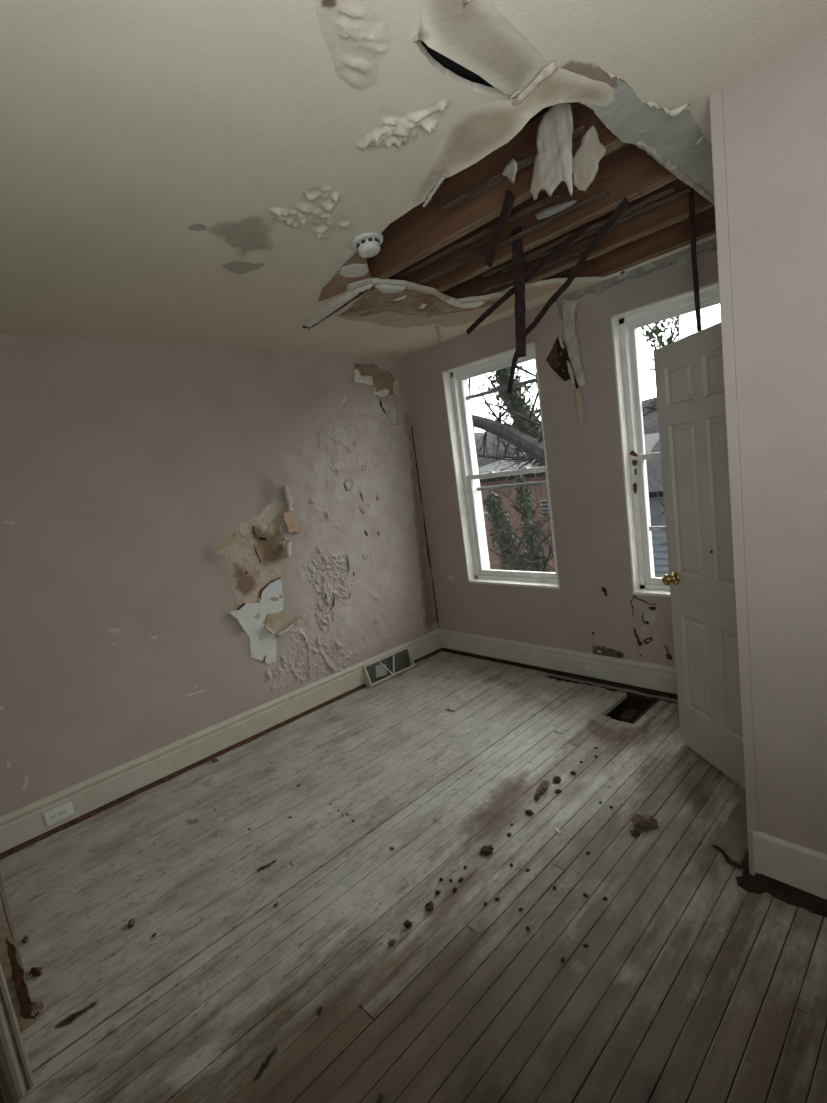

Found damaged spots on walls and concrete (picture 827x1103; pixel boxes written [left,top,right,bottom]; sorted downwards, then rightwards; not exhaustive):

spalling [422,42,494,87]
peeling [645,101,690,117]
spalling [636,140,715,205]
peeling [353,363,399,425]
peeling [196,455,305,665]
peeling [633,606,672,660]
spalling [0,898,36,1032]